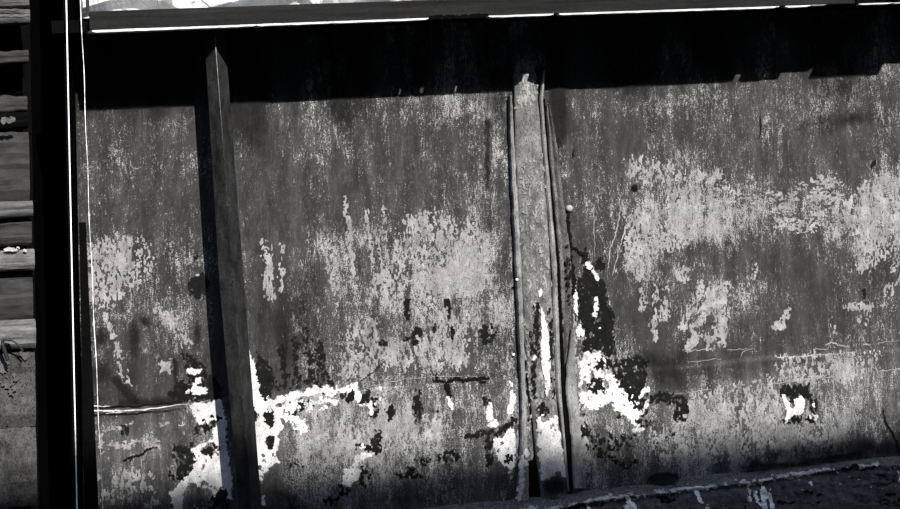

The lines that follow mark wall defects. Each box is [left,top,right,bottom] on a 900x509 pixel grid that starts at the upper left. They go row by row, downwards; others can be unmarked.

water stain [543,22,567,148]
peeling [249,195,499,506]
spalling [464,153,900,509]